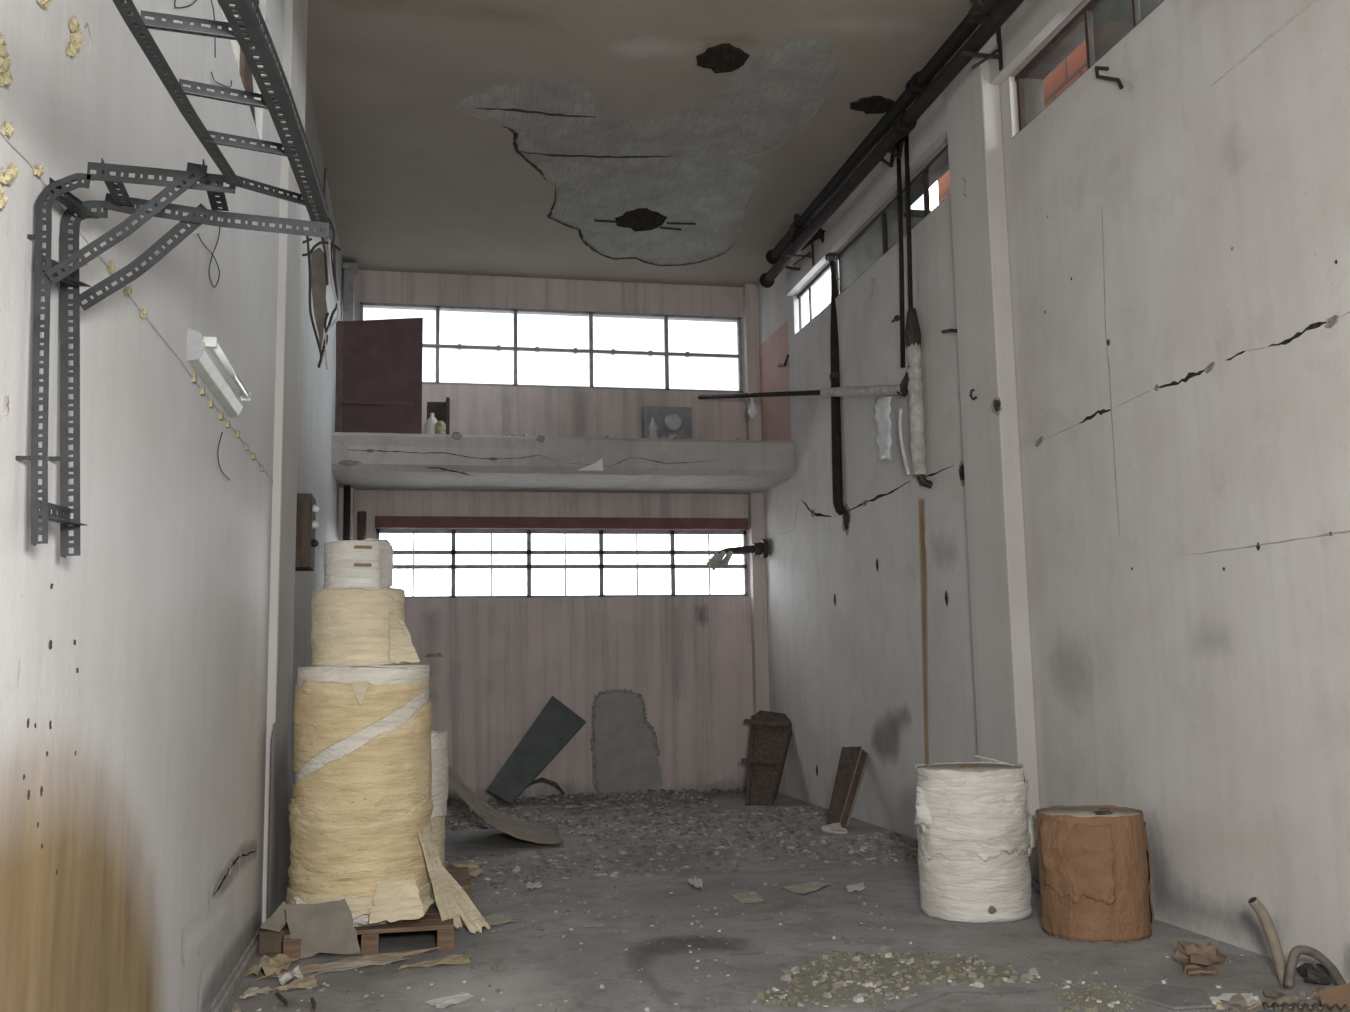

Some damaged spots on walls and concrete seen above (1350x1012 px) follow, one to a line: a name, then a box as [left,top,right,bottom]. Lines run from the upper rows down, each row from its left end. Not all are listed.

spalling [696,43,750,73]
spalling [595,208,696,232]
crack [1032,206,1350,535]
crack [780,466,952,534]
crack [1190,530,1350,555]